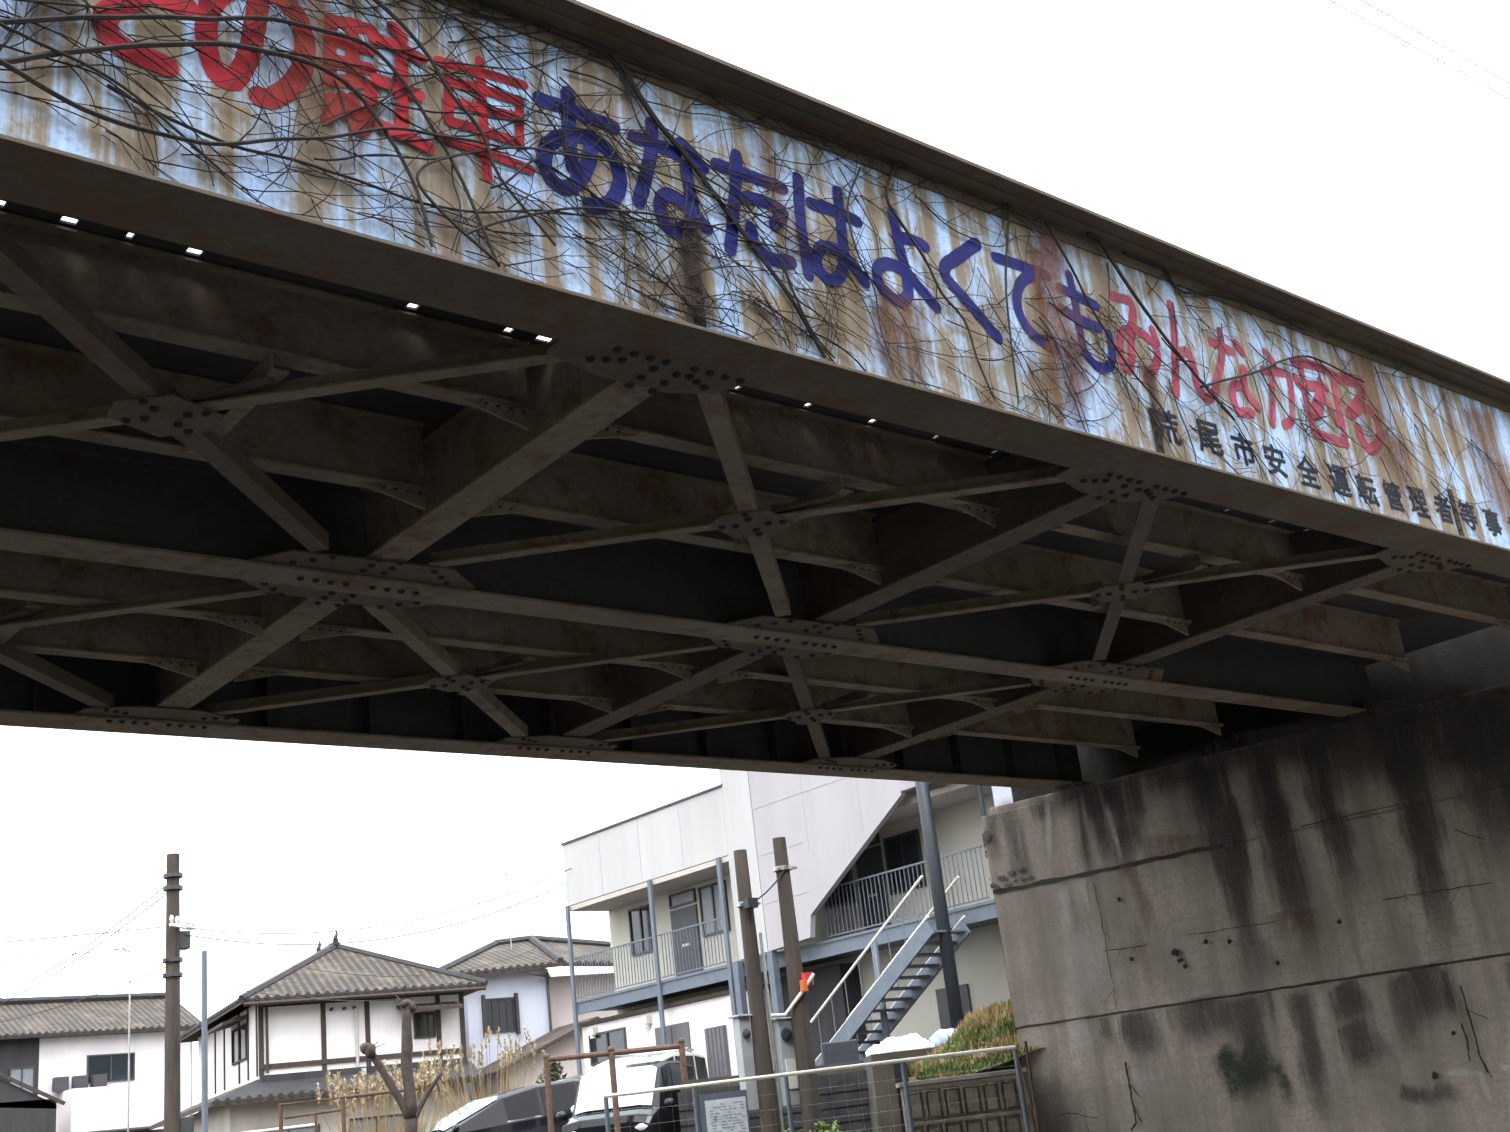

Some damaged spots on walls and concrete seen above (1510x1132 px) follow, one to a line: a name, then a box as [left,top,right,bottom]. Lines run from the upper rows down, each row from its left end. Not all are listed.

rust [1144,370,1164,441]
water stain [1029,688,1510,935]
water stain [1167,995,1323,1099]
water stain [1330,981,1380,1063]
crack [1460,986,1492,1078]